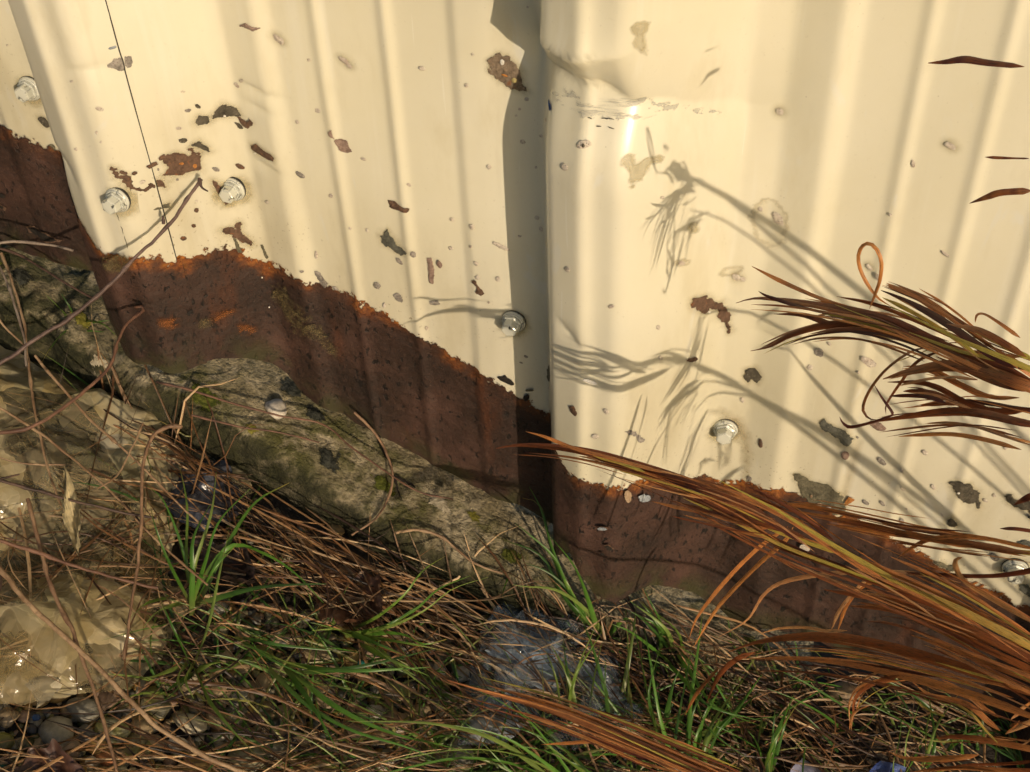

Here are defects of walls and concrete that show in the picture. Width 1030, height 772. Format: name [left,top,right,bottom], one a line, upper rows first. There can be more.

rust [0,125,1030,688]
peeling [819,419,853,460]
peeling [793,474,854,515]
peeling [949,482,981,509]
rust [822,642,1030,768]